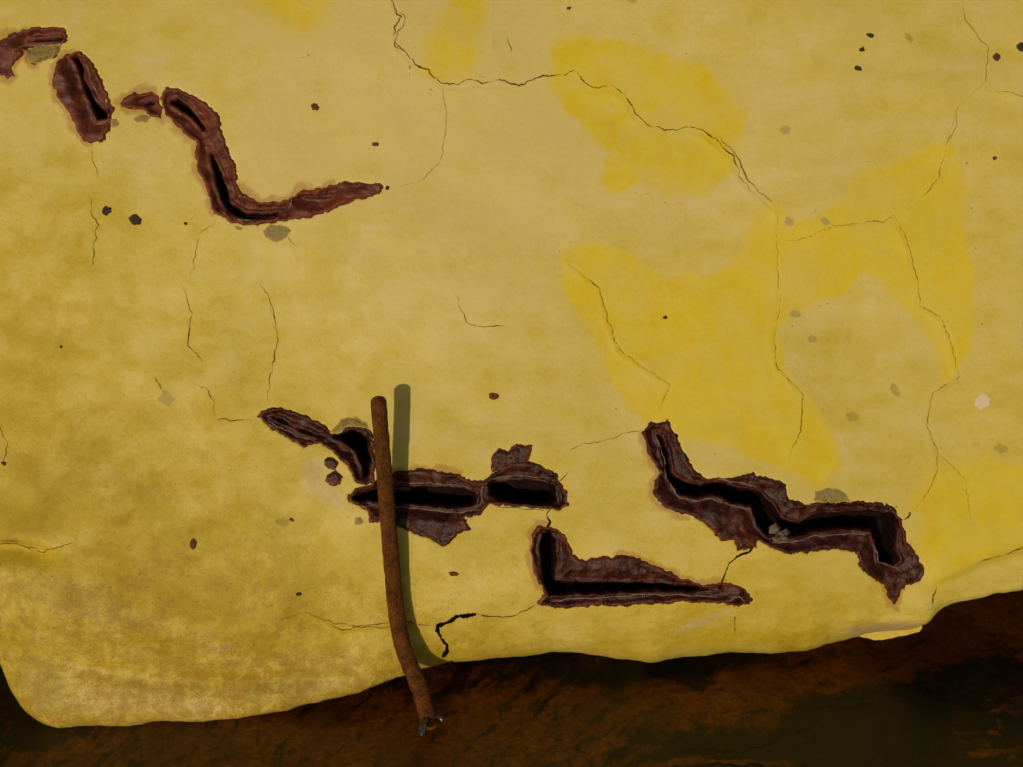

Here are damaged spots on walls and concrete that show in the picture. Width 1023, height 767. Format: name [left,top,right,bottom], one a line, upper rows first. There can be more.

peeling [128,214,142,225]
crack [0,0,775,359]
crack [926,1,1023,193]
crack [0,540,71,553]
peeling [287,446,354,521]
crack [192,211,970,663]
corrosion [0,590,1023,767]